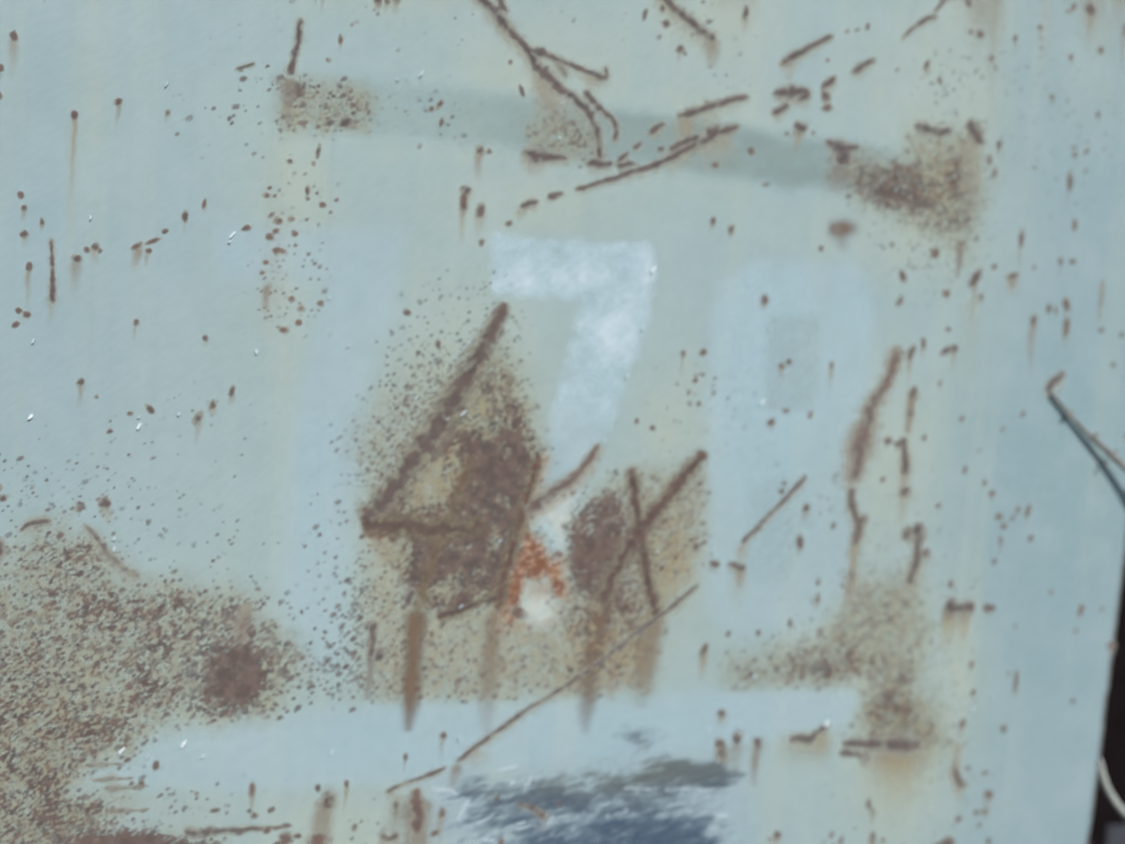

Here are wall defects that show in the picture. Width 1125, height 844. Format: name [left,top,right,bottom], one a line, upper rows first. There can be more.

corrosion [642,5,670,28]
corrosion [236,18,391,166]
corrosion [476,145,492,162]
corrosion [812,113,1019,306]
corrosion [0,295,712,844]
corrosion [725,555,996,781]
corrosion [715,729,762,771]